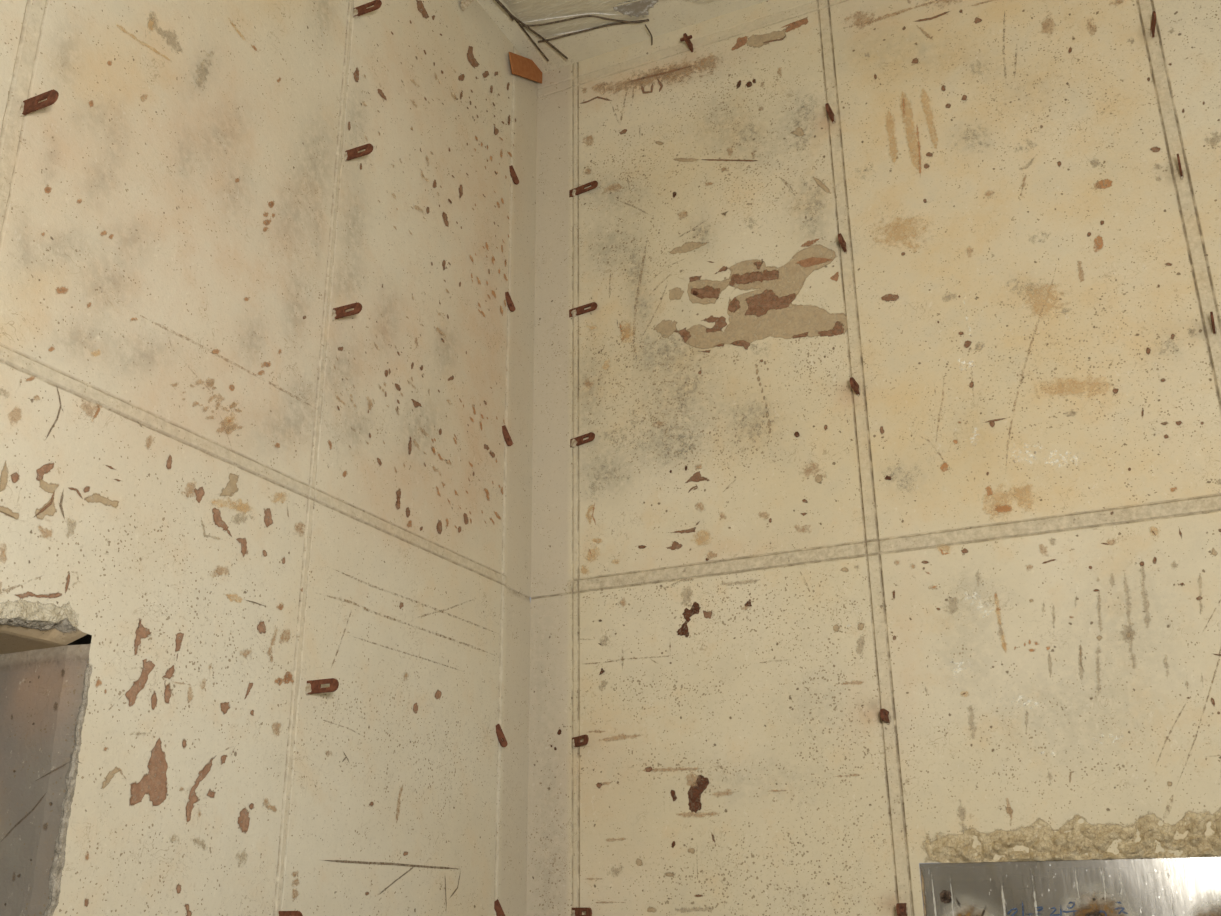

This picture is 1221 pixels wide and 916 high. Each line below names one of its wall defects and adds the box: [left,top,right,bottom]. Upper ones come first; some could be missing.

peeling [654,239,848,353]
peeling [34,463,119,538]
spalling [0,573,78,633]
peeling [110,619,184,710]
peeling [257,621,290,661]
spalling [43,665,92,916]
peeling [102,738,227,822]
spalling [923,801,1221,863]